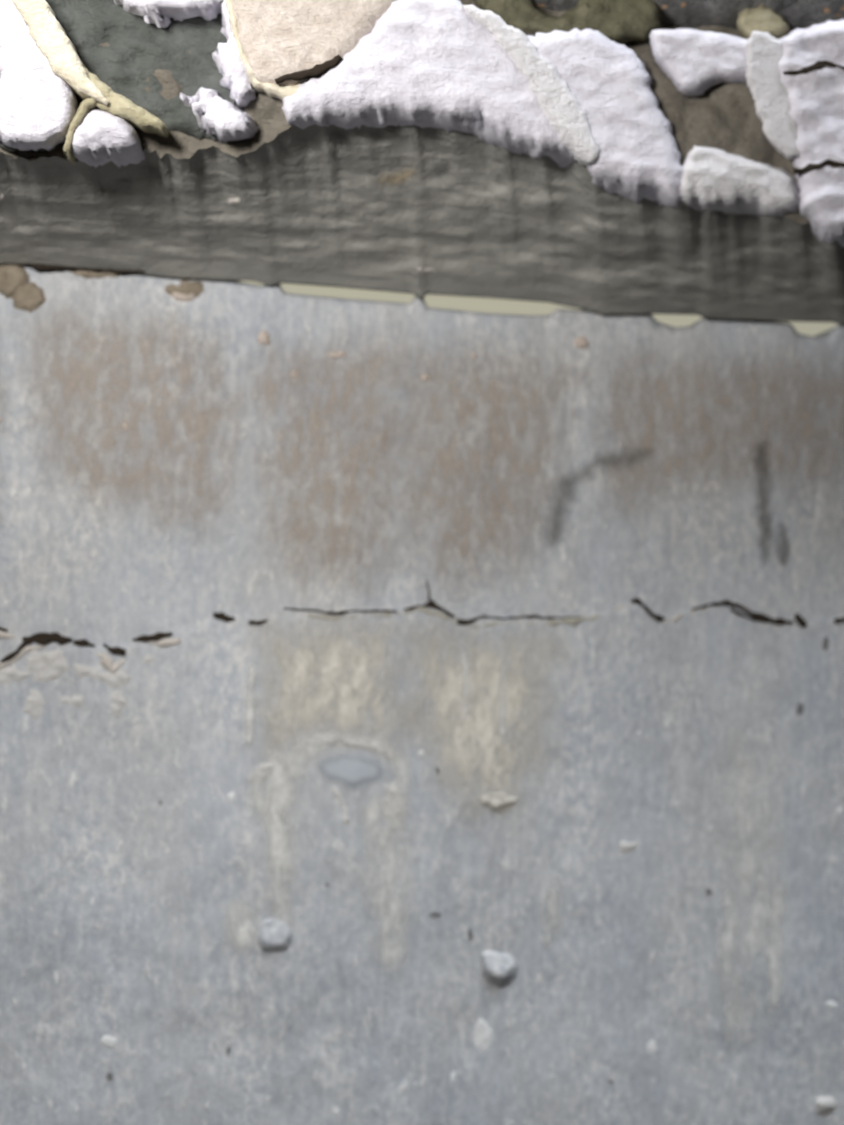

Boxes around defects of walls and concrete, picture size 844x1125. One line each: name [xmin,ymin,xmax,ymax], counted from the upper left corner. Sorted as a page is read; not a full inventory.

crack [0,627,181,673]
water stain [245,632,396,743]
water stain [422,639,538,796]
crack [213,580,807,629]
water stain [364,799,408,965]
water stain [721,758,782,1006]